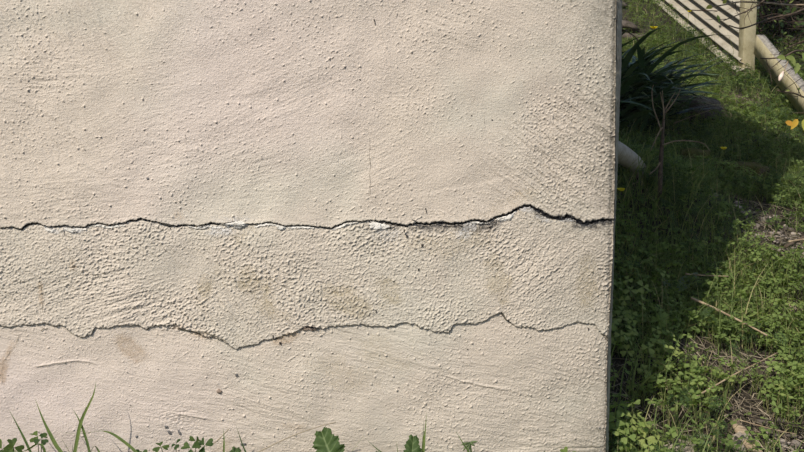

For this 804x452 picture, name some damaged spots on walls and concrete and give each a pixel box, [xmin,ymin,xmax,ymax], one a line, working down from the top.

crack [0,205,612,235]